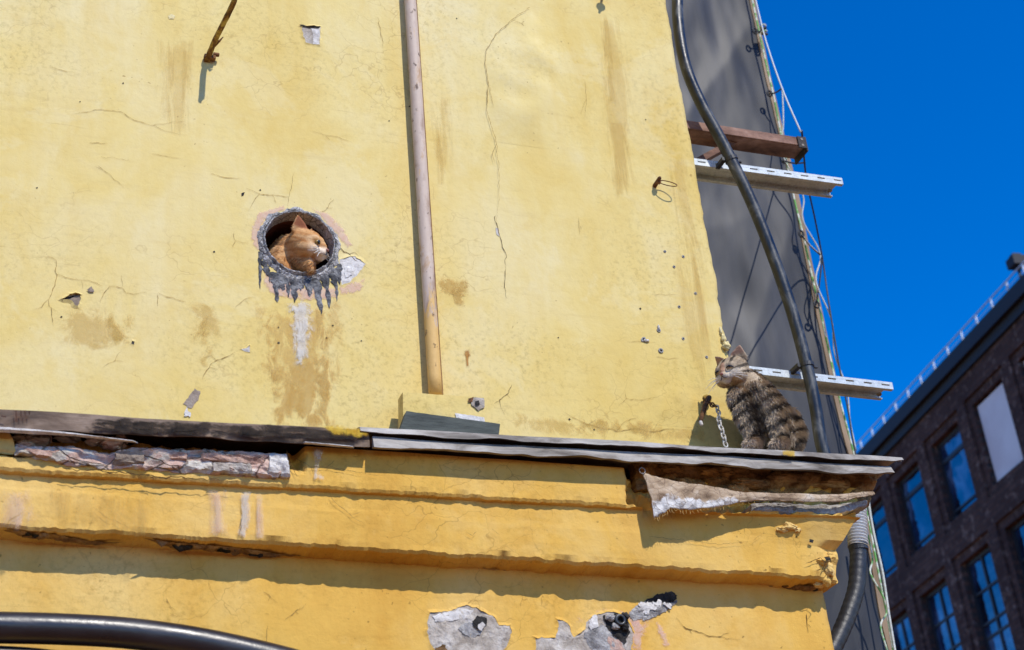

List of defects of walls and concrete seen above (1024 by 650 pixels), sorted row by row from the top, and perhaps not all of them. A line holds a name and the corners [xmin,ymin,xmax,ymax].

peeling [300,24,323,47]
peeling [265,211,369,300]
spalling [58,286,94,309]
water stain [290,302,312,362]
flaking render [776,522,814,543]
flaking render [769,551,836,592]
spalling [422,602,515,650]
spalling [531,591,677,650]